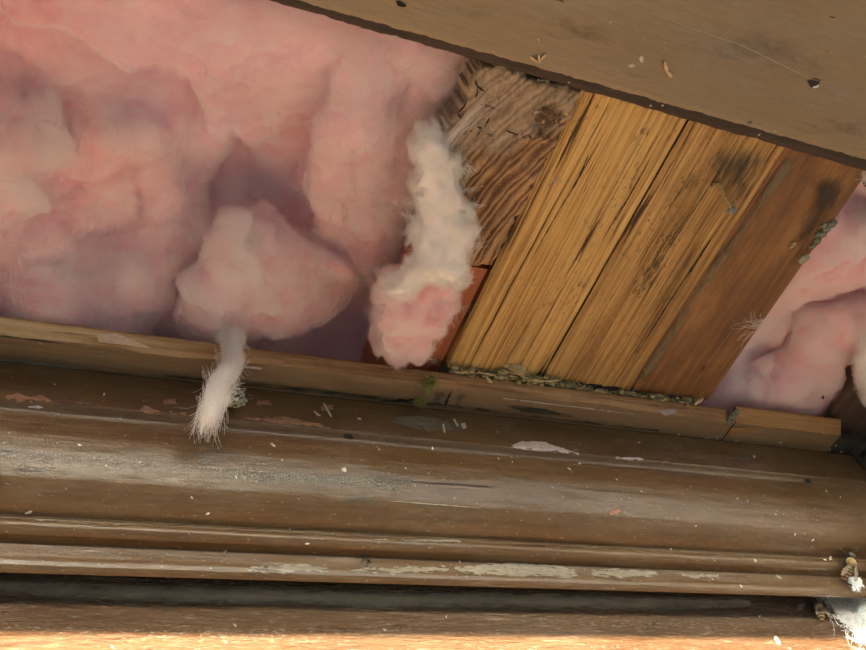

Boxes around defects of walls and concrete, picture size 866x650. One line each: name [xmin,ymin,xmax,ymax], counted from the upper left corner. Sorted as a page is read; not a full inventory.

peeling [5,393,52,409]
peeling [139,398,187,417]
peeling [241,416,332,429]
peeling [246,562,578,578]
peeling [591,568,658,579]
peeling [680,571,720,579]